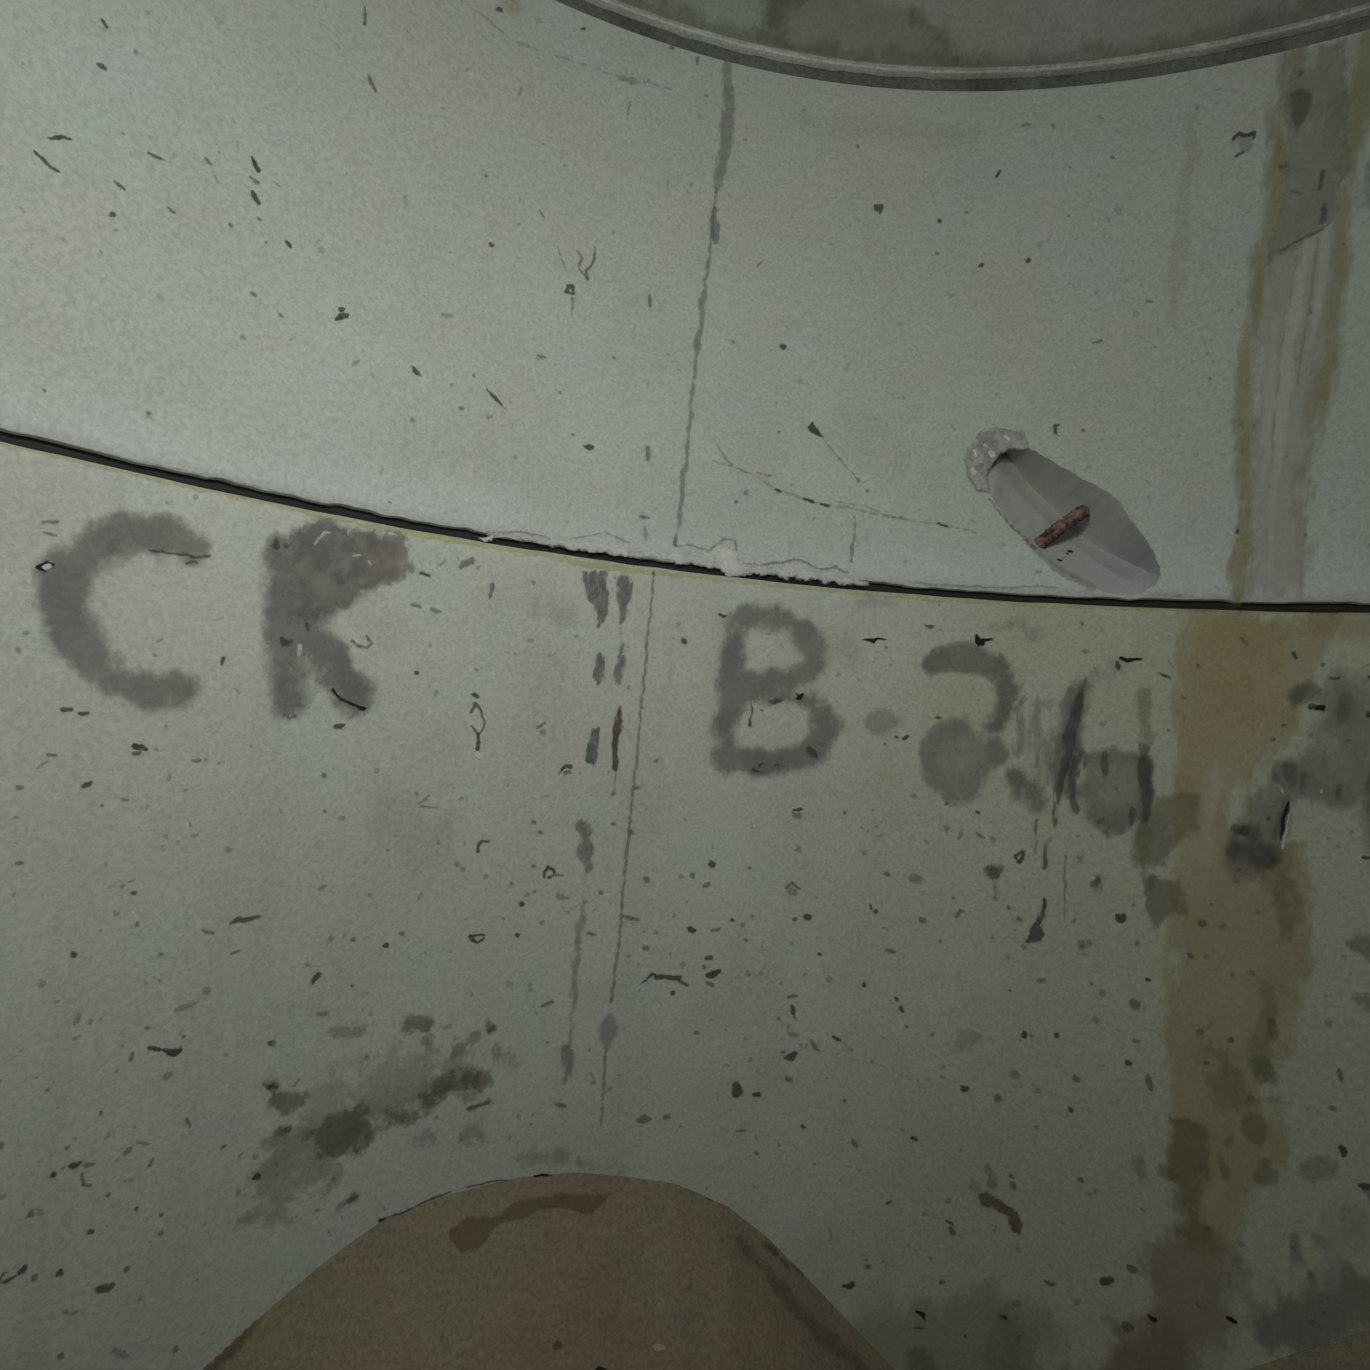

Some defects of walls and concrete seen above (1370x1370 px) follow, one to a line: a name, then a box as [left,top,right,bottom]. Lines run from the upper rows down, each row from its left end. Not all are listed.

corrosion [1034,505,1090,549]
leakage [1177,610,1334,803]